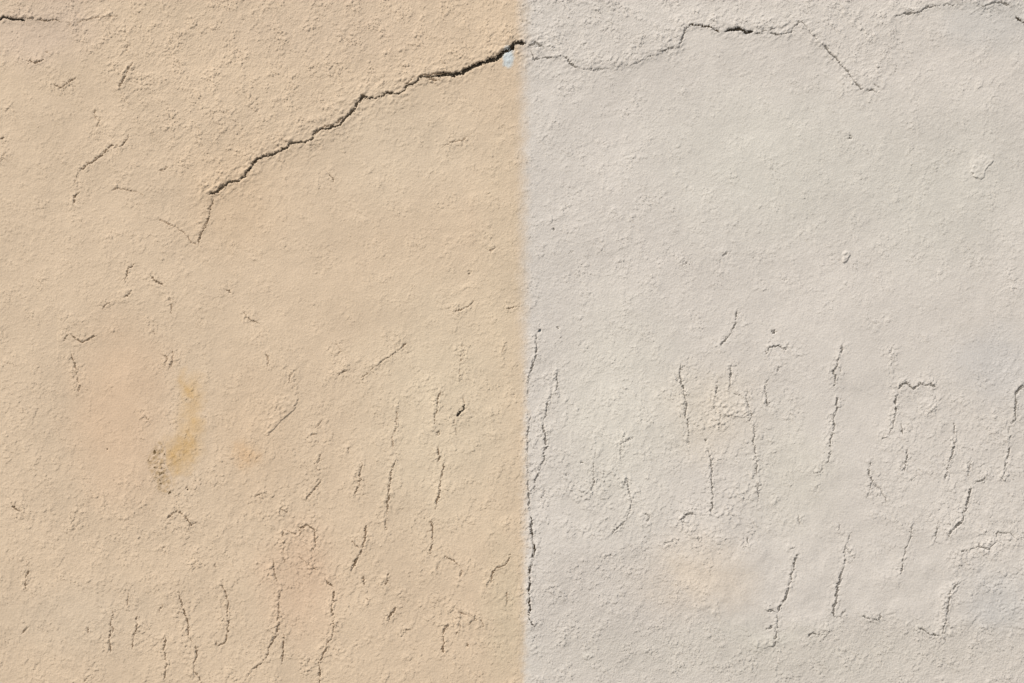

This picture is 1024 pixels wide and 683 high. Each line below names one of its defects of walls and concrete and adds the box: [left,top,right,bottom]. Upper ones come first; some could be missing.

crack [633,22,897,91]
crack [159,41,603,245]
crack [87,567,229,683]
crack [247,418,397,683]
crack [428,393,465,576]
crack [664,311,789,545]
crack [768,514,800,647]
crack [819,347,843,473]
crack [809,523,881,641]
crack [881,380,937,482]
crack [919,580,958,642]
crack [901,380,1024,573]